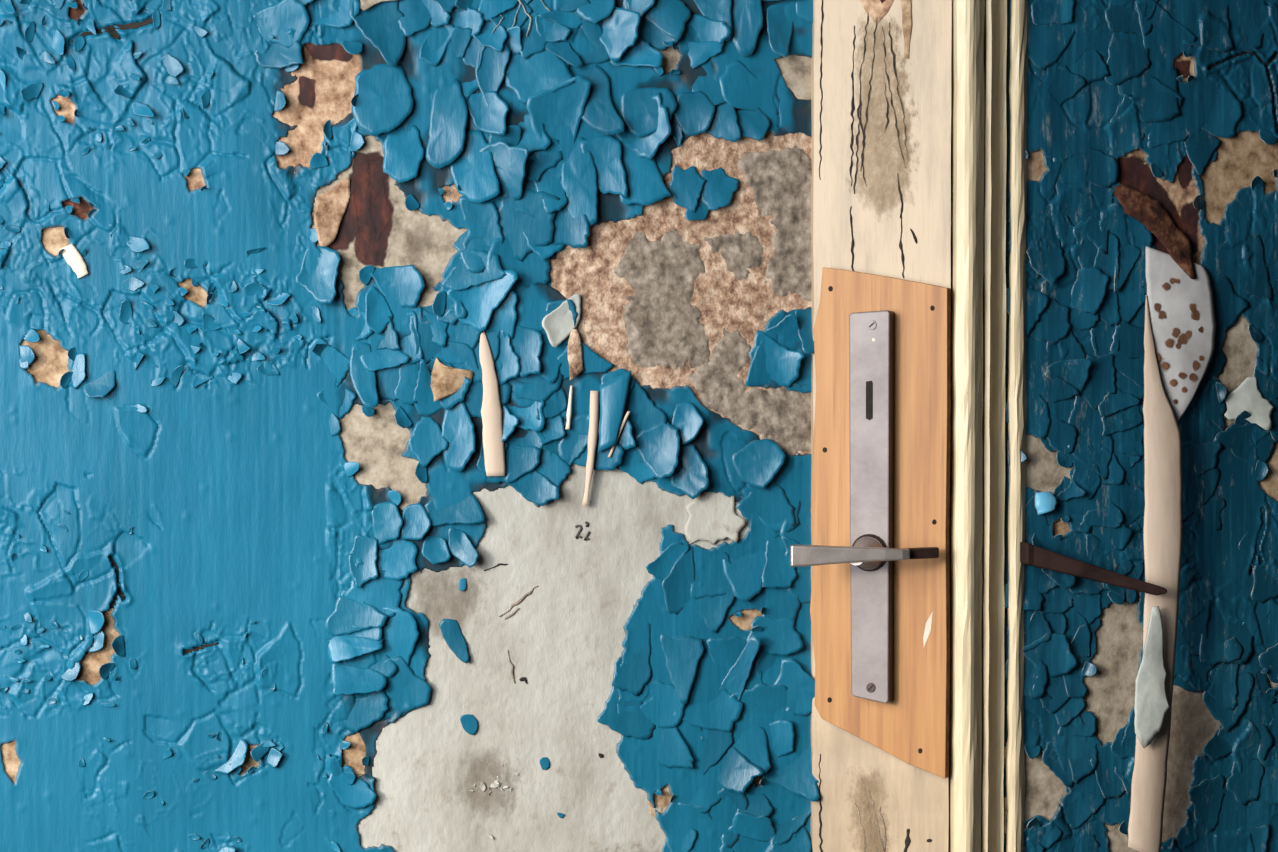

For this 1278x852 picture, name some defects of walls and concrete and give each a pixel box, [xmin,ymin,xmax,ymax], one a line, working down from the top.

peeling [0,0,96,70]
peeling [20,52,163,159]
crack [1208,51,1278,133]
flaking render [42,198,97,278]
corrosion [325,152,393,267]
corrosion [1118,156,1200,254]
flaking render [19,328,116,398]
flaking render [110,0,820,852]
peeling [1003,0,1278,852]
crack [105,557,126,616]
crack [184,642,219,654]